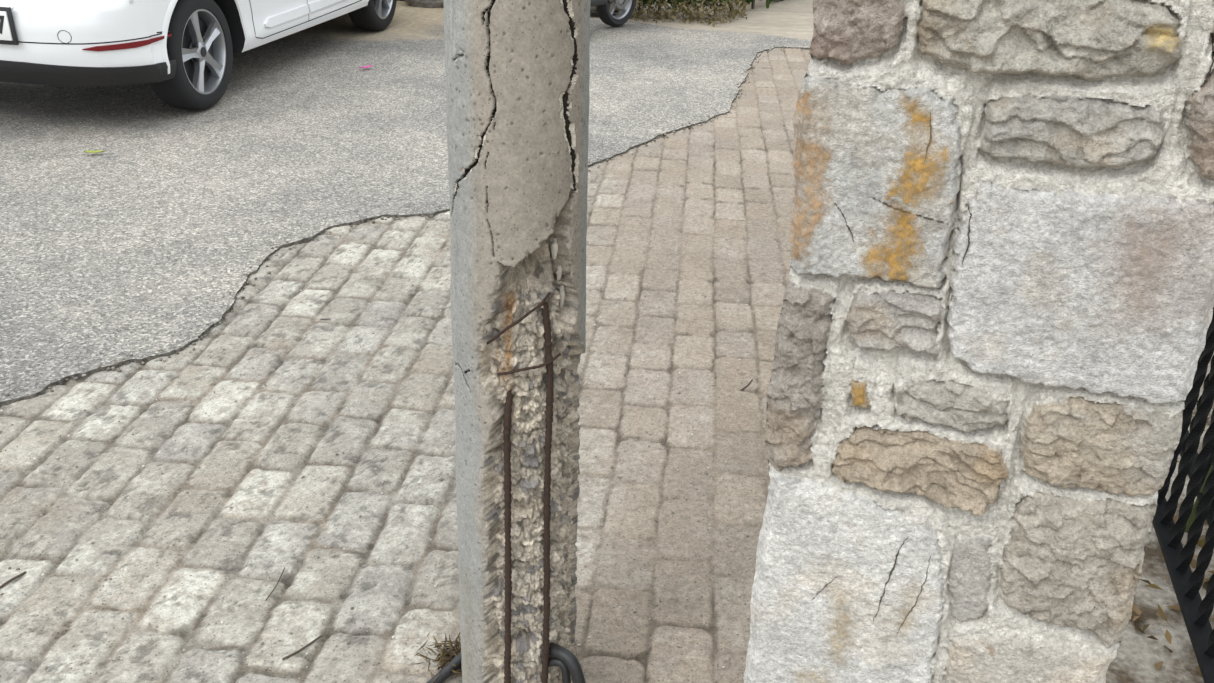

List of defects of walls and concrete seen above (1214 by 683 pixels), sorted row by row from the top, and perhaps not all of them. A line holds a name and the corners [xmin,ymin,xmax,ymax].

corrosion [906,100,930,126]
corrosion [789,139,830,259]
corrosion [864,149,947,281]
crack [873,537,931,636]